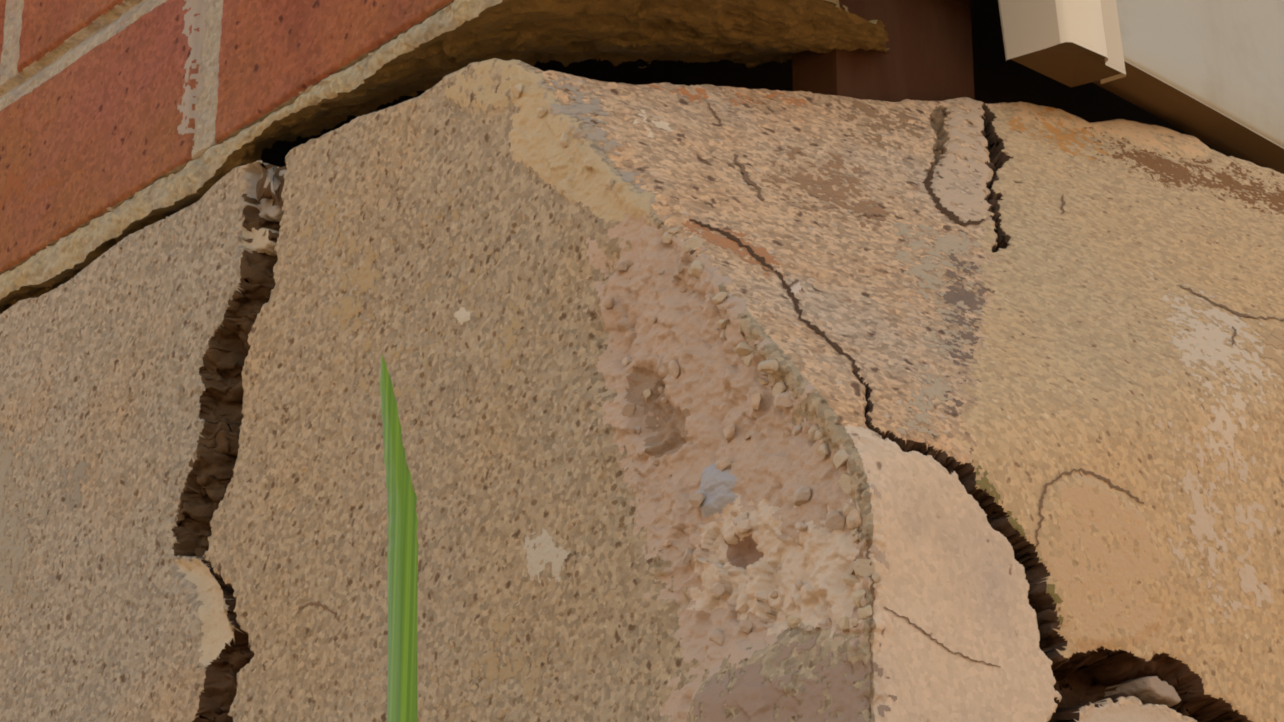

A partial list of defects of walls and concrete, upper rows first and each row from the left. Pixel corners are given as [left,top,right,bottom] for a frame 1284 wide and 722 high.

crack [709,103,765,200]
crack [923,103,1013,253]
spalling [0,0,889,722]
crack [1179,284,1284,345]
crack [171,156,287,722]
crack [689,219,1253,722]
crack [296,602,336,614]